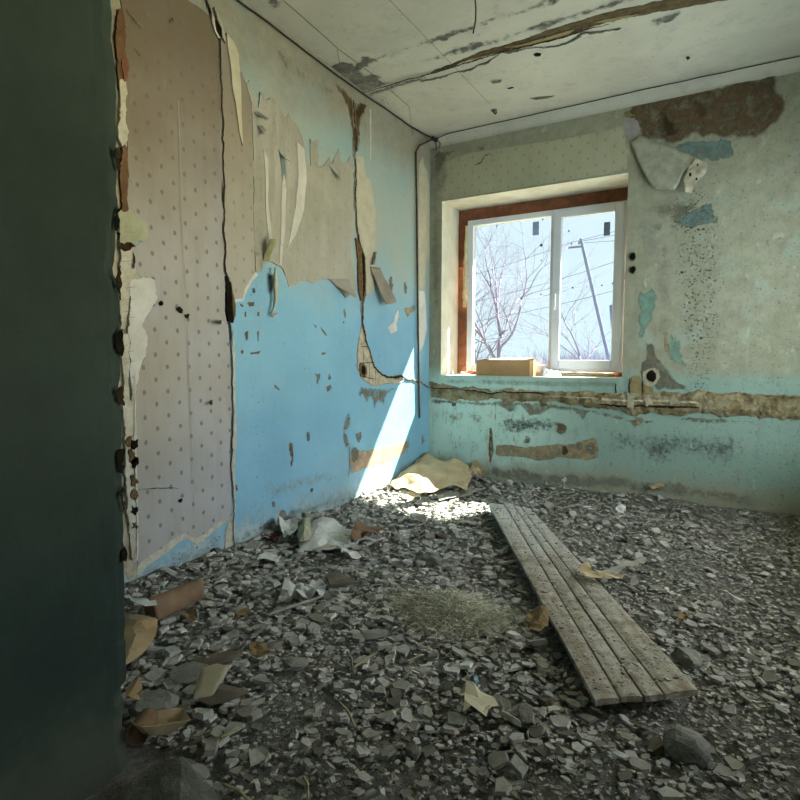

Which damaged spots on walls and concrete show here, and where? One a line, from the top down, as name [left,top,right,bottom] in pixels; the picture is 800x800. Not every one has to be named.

water stain [431,27,472,43]
peeling [226,33,243,146]
water stain [332,56,422,104]
spalling [623,111,641,140]
peeling [676,139,733,161]
crack [351,0,727,388]
peeling [673,204,717,230]
spalling [111,0,157,580]
peeling [639,278,657,337]
spalling [628,368,660,394]
peeling [343,414,409,474]
peeling [495,423,600,461]